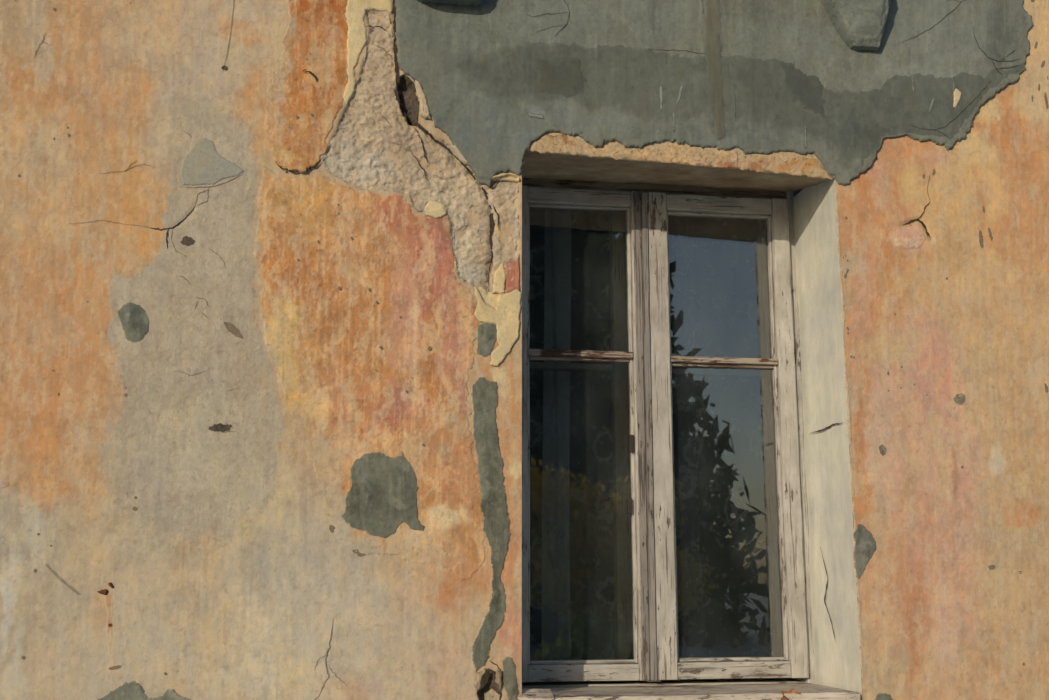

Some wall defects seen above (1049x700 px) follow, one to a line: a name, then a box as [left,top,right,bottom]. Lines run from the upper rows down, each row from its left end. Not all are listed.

crack [914,29,1019,139]
crack [368,0,503,292]
crack [70,175,241,318]
peeling [105,0,520,581]
crack [904,177,931,238]
crack [314,625,347,700]
spalling [474,668,503,700]